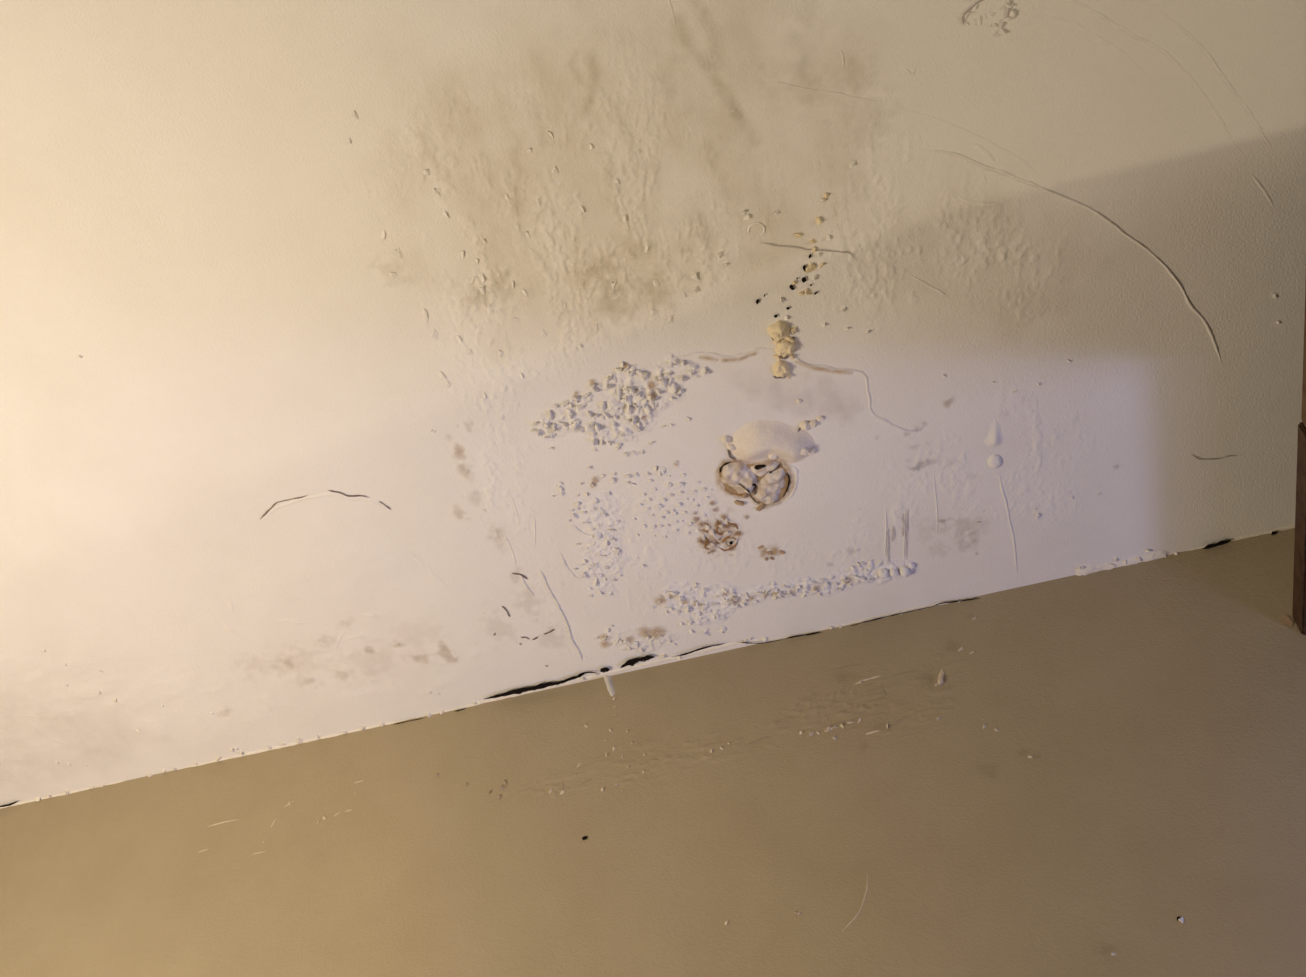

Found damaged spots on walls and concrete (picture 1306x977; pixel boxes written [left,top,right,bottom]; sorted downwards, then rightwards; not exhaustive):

spalling [756,193,830,320]
crack [260,490,396,524]
peeling [531,347,925,598]
peeling [594,557,921,654]
crack [1075,524,1295,576]
crack [0,595,981,809]